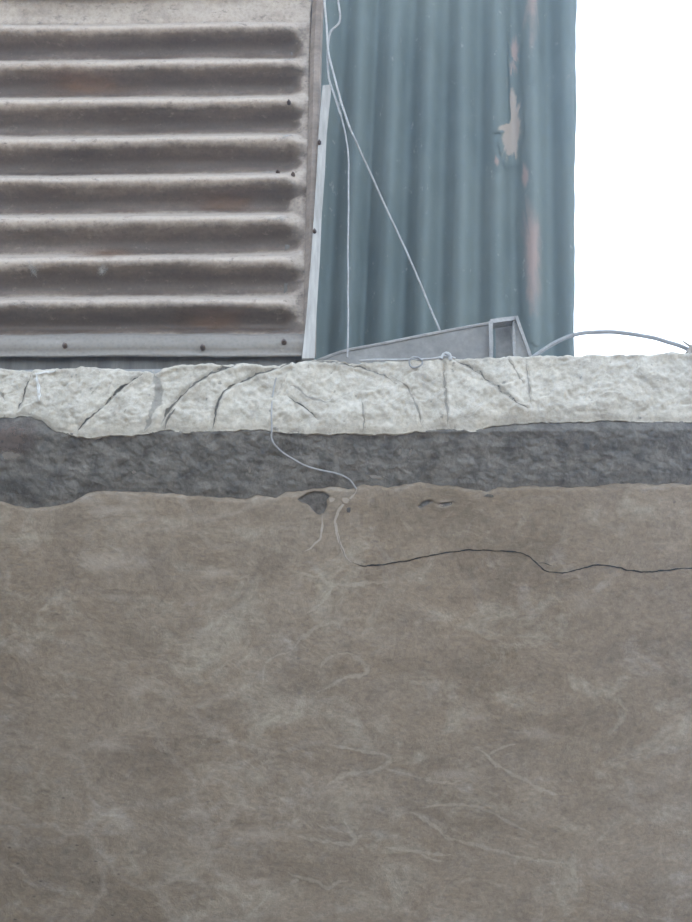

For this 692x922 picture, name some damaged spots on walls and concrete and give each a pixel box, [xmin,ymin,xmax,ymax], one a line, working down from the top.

crack [0,375,31,408]
crack [78,360,423,432]
crack [442,359,531,428]
spalling [0,416,692,515]
crack [261,489,692,693]